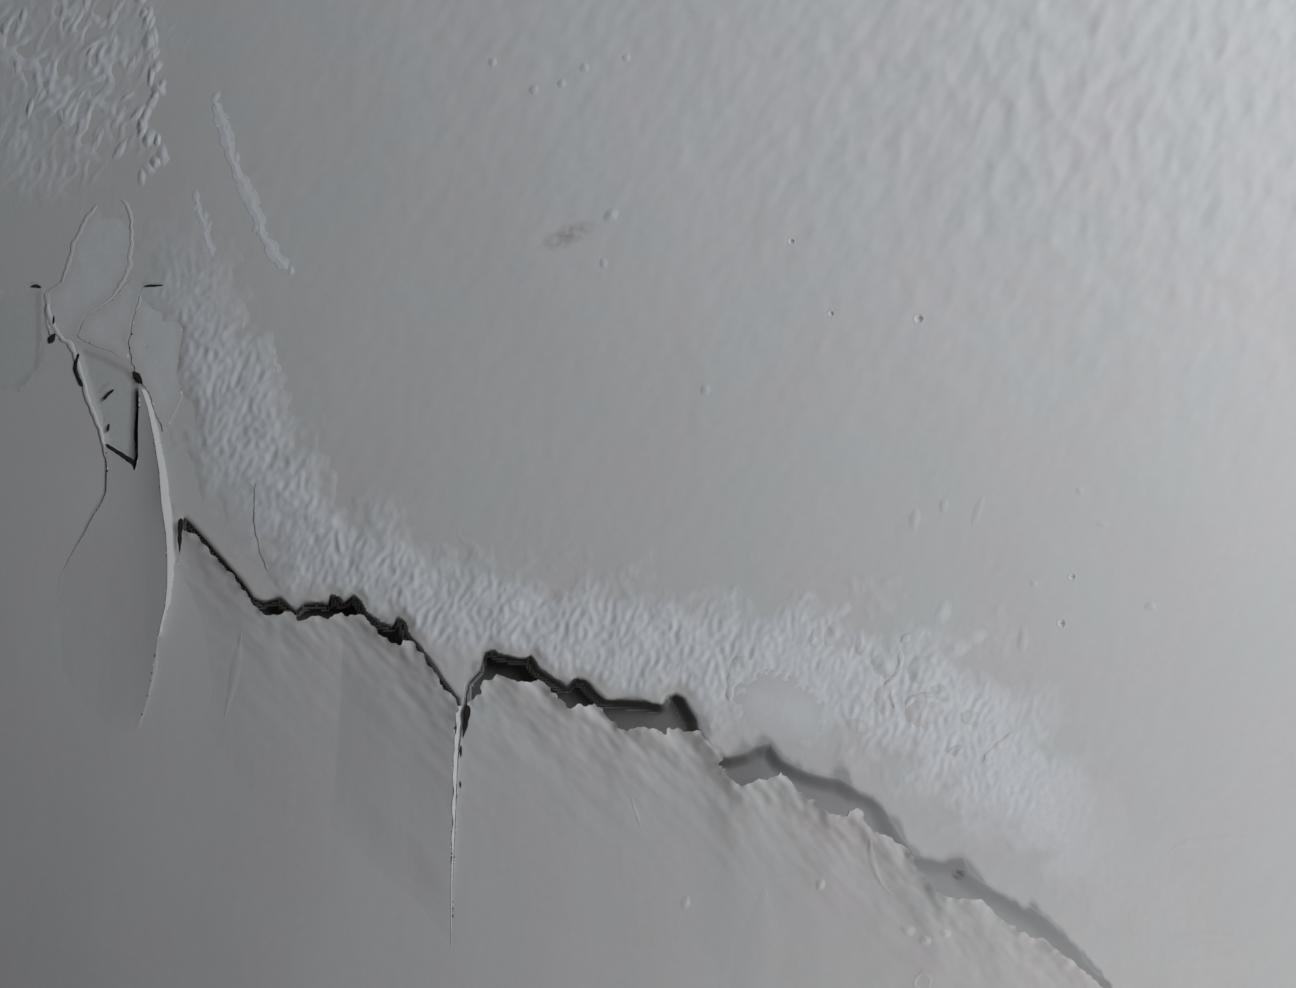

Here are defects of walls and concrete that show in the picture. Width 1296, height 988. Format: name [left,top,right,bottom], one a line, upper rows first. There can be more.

peeling [31,198,1103,988]
crack [177,484,1119,988]